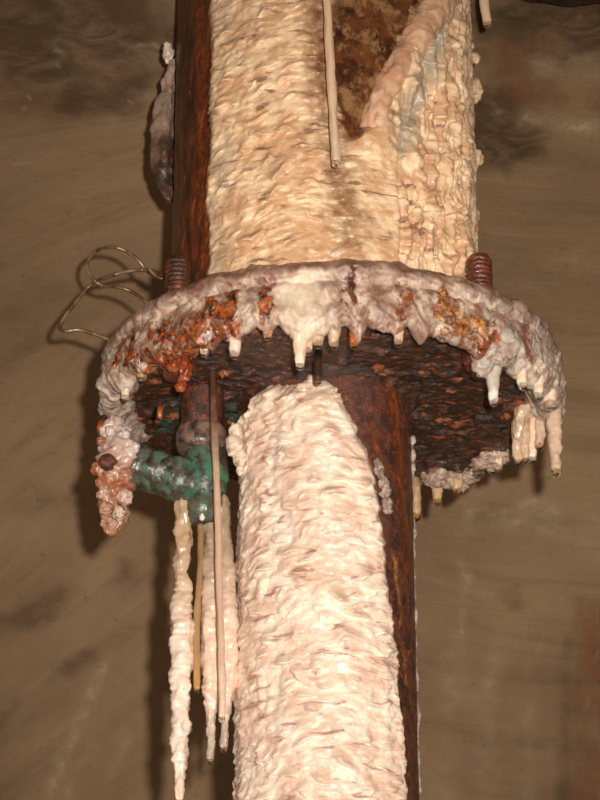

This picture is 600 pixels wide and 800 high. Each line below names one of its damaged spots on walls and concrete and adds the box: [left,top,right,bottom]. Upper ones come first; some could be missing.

damp [481,0,600,60]
corrosion [181,0,211,269]
corrosion [110,284,245,375]
corrosion [257,277,276,326]
corrosion [340,263,357,305]
corrosion [396,271,414,335]
corrosion [432,282,503,360]
corrosion [521,324,533,363]
damp [90,0,567,800]